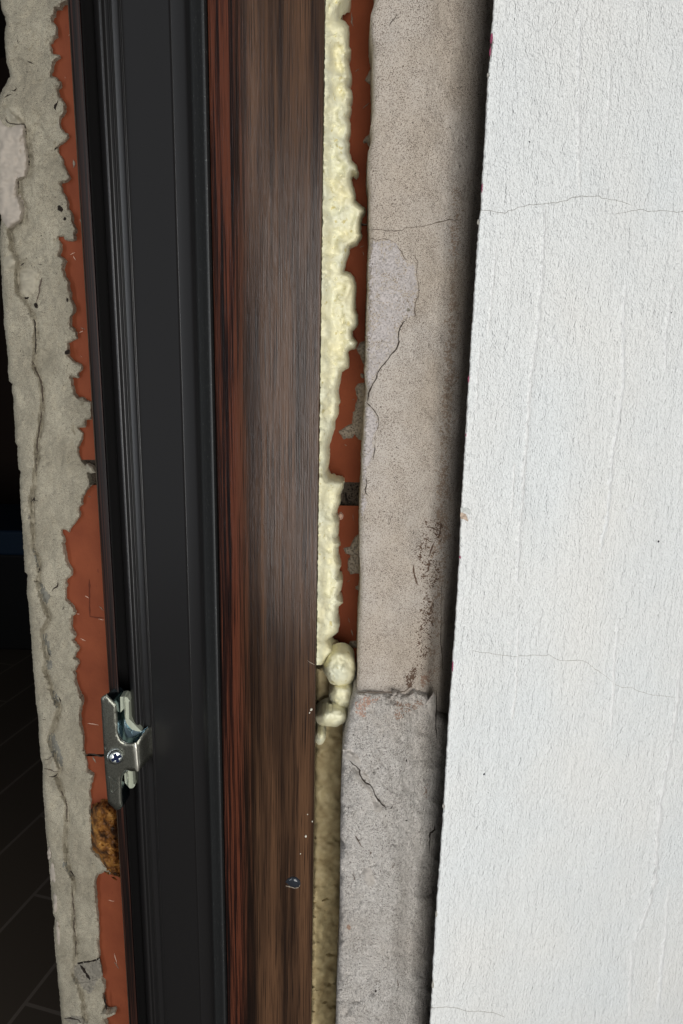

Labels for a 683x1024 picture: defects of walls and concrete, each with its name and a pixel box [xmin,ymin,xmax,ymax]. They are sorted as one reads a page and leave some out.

flaking render [367,240,418,390]
crack [365,196,683,497]
crack [350,761,393,809]